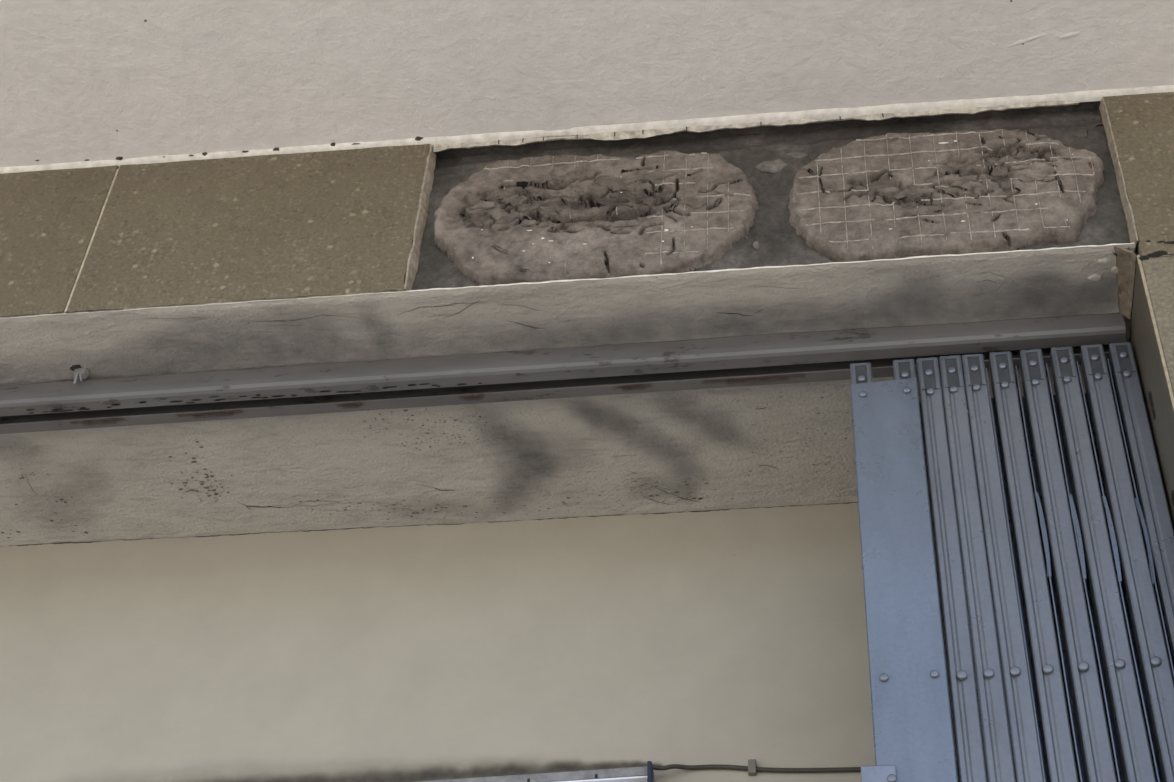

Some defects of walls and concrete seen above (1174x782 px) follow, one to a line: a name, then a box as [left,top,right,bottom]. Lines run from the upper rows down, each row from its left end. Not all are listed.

peeling [404,96,1138,319]